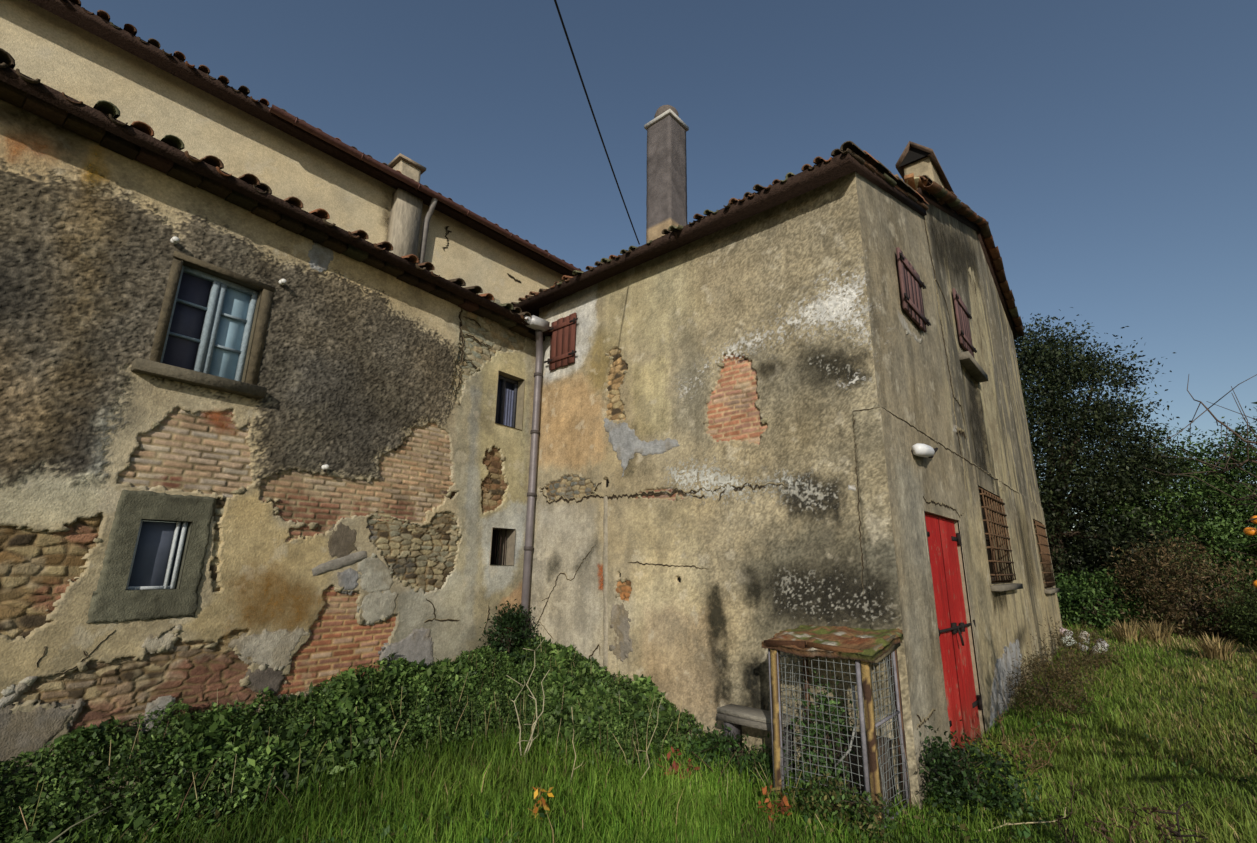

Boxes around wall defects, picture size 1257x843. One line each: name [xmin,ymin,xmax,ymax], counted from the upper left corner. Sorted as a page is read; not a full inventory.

crack [453,308,491,396]
damp [681,272,871,393]
spalling [703,353,769,445]
spalling [116,408,461,593]
spalling [481,446,508,513]
spalling [0,513,103,639]
spalling [0,585,396,772]
crack [531,546,594,639]
flaking render [609,578,633,662]
damp [708,585,729,700]
damp [744,658,764,709]
damp [746,566,893,626]